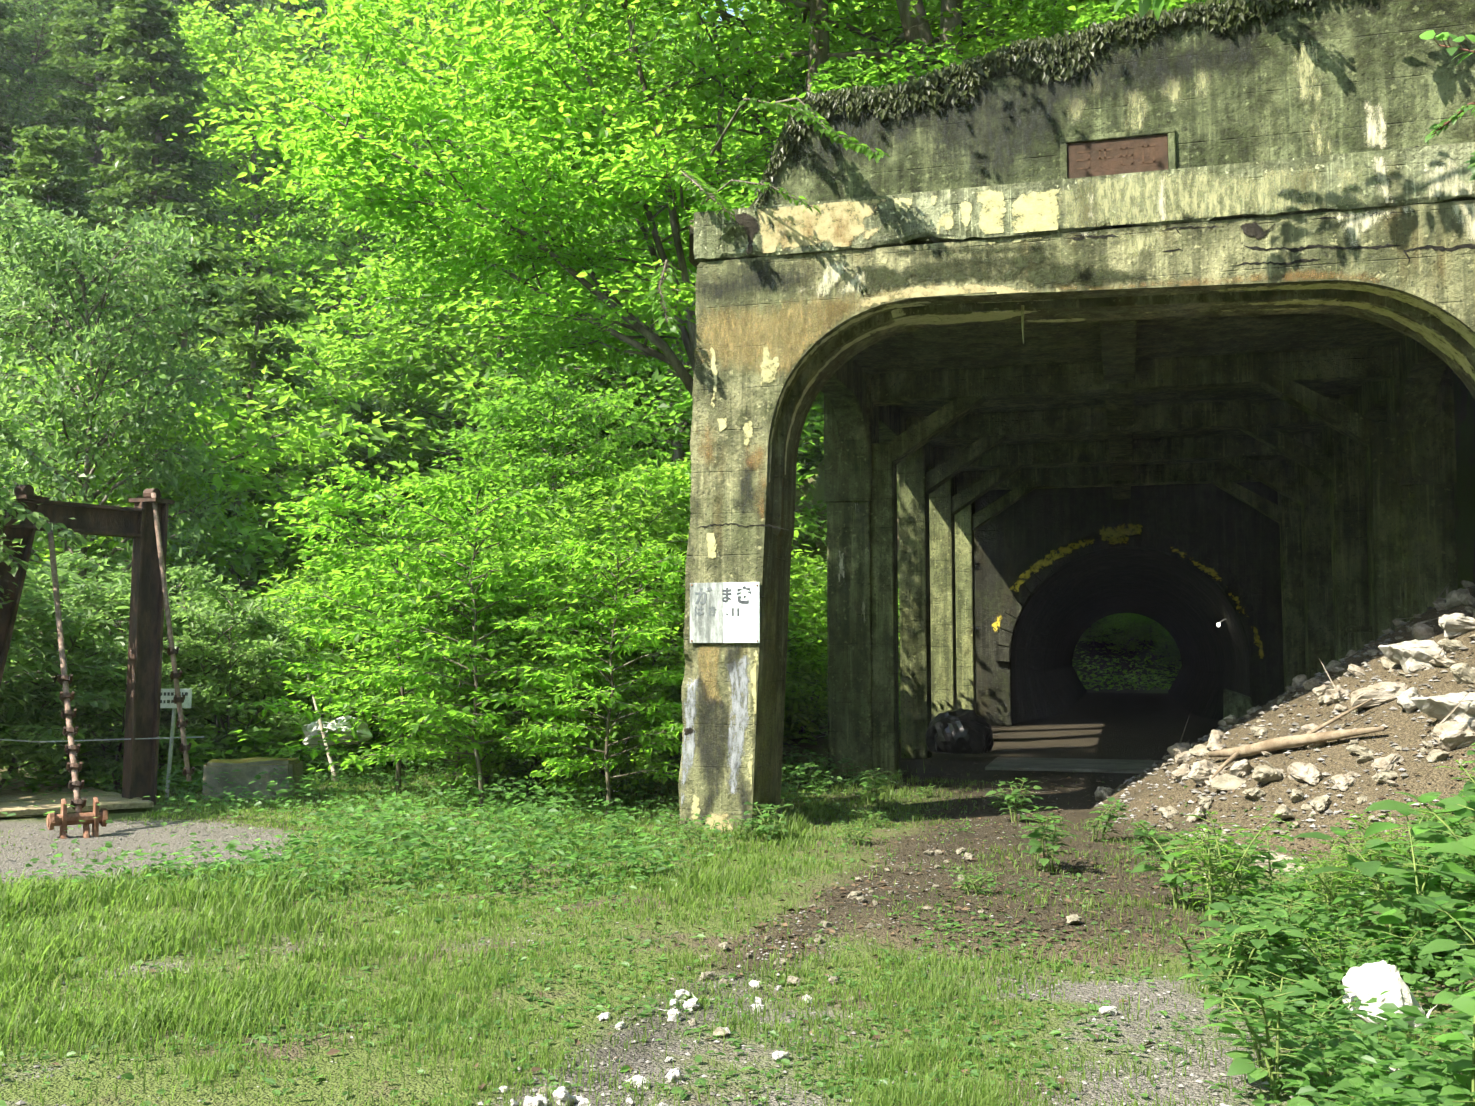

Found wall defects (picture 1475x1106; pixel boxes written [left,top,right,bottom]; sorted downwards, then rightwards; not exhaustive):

damp [794,35,1257,184]
damp [1297,45,1321,100]
damp [1365,104,1392,203]
peeling [731,197,912,254]
peeling [927,168,1318,254]
crack [1153,203,1475,266]
peeling [1209,283,1475,381]
damp [697,678,736,820]